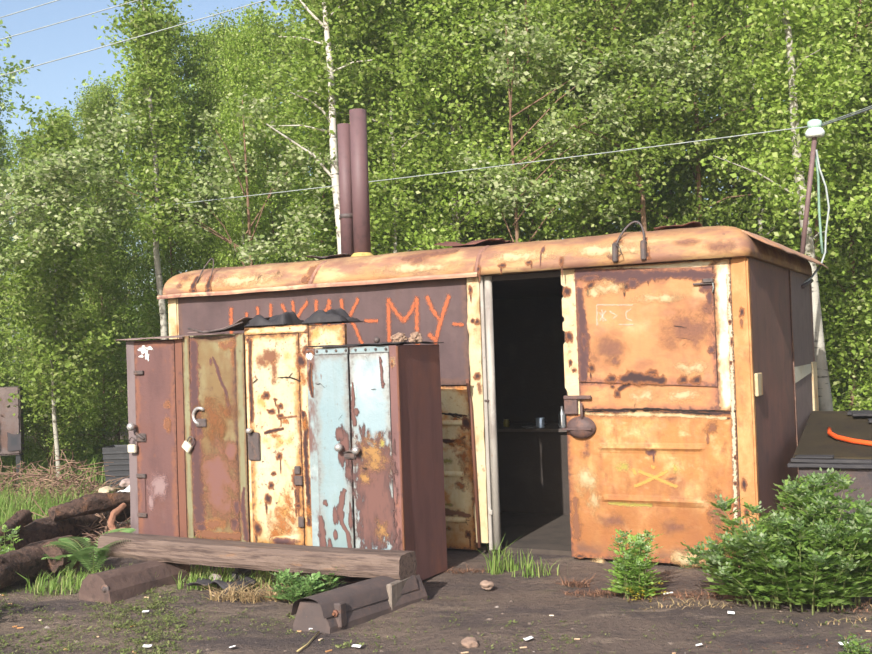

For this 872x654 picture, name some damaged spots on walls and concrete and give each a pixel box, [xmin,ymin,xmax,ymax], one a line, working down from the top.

corrosion [177,275,213,293]
corrosion [301,265,317,284]
corrosion [559,237,716,398]
corrosion [189,337,314,543]
peeling [317,382,402,550]
corrosion [443,416,470,489]
peeling [585,274,738,524]
corrosion [705,420,717,445]
corrosion [445,508,471,518]
corrosion [571,496,583,540]